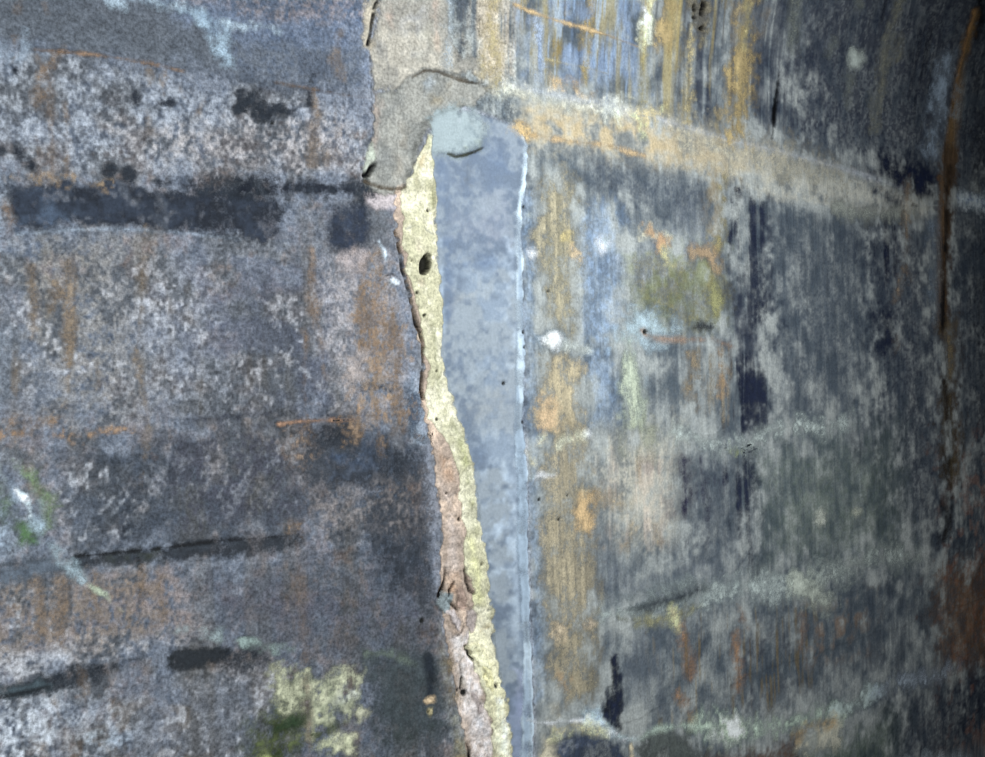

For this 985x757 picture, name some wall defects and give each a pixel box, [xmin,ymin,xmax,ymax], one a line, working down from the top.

leakage [232,89,291,122]
leakage [0,147,35,169]
leakage [10,164,374,253]
rust [923,0,985,420]
spalling [362,0,540,757]
leakage [168,630,445,757]
leakage [552,654,958,757]